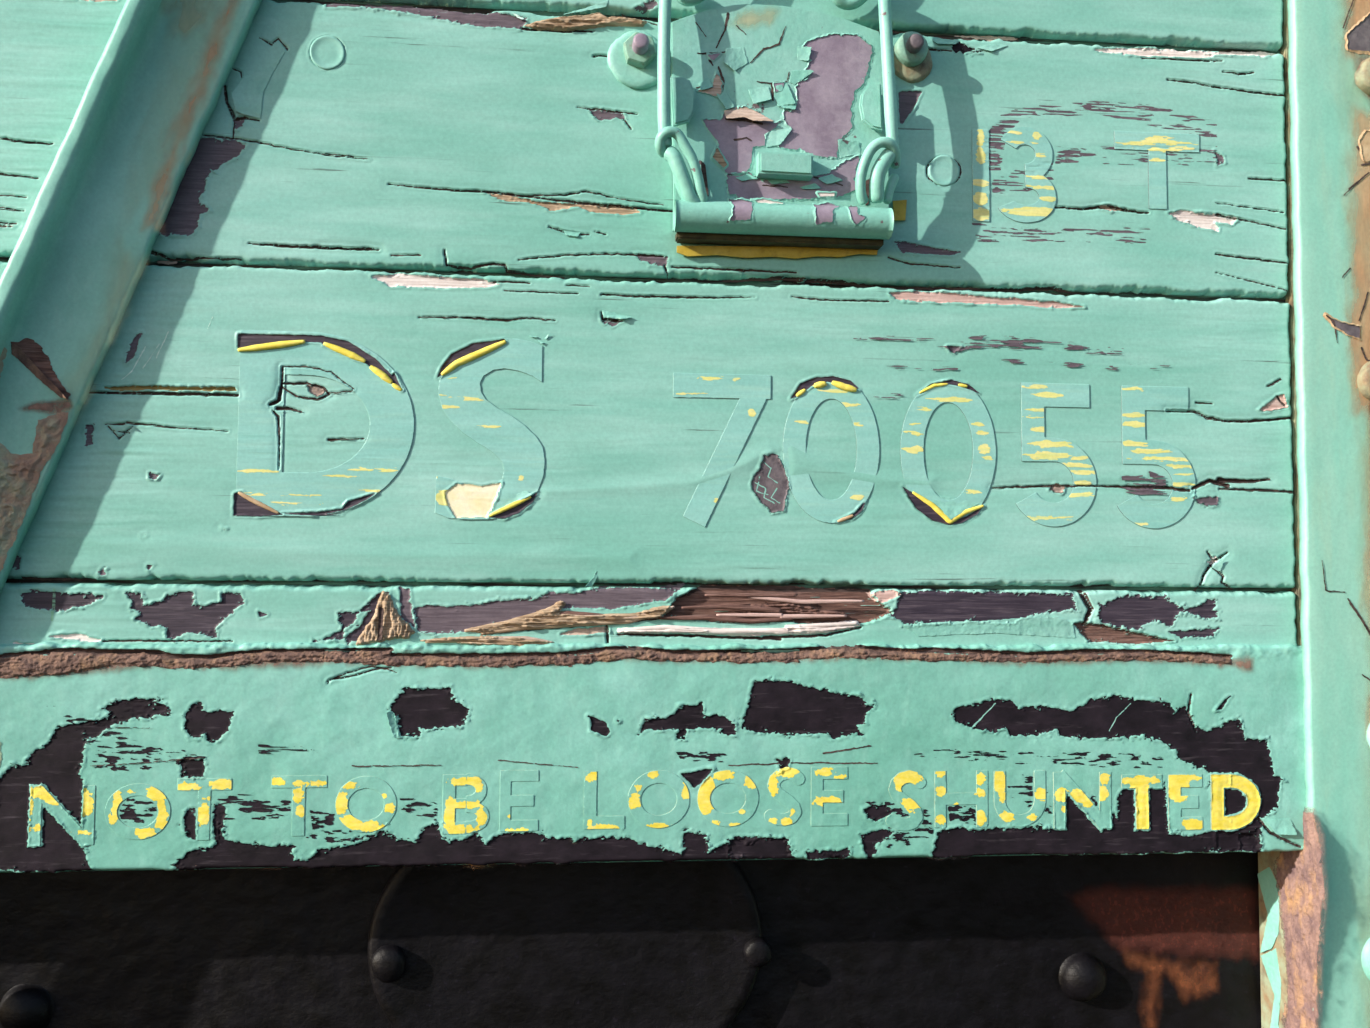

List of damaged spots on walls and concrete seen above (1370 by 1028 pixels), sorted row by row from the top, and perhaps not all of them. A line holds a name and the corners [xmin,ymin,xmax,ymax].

rust [1348,0,1370,30]
crack [1167,71,1284,96]
crack [388,184,673,215]
crack [1055,205,1149,214]
crack [151,243,1082,321]
rust [1351,114,1370,406]
peeling [13,591,267,644]
peeling [637,679,878,741]
peeling [0,697,234,873]
peeling [170,687,1301,1028]
rust [1076,887,1259,1028]
rust [1274,811,1326,1028]